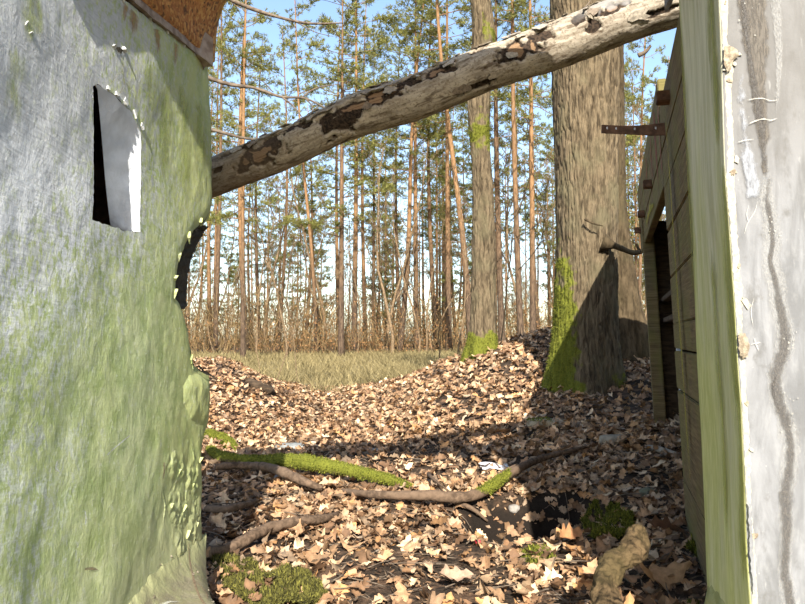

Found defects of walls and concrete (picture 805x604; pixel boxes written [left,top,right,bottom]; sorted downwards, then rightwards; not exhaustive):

spalling [106,85,145,130]
peeling [720,0,758,604]
water stain [738,0,797,604]